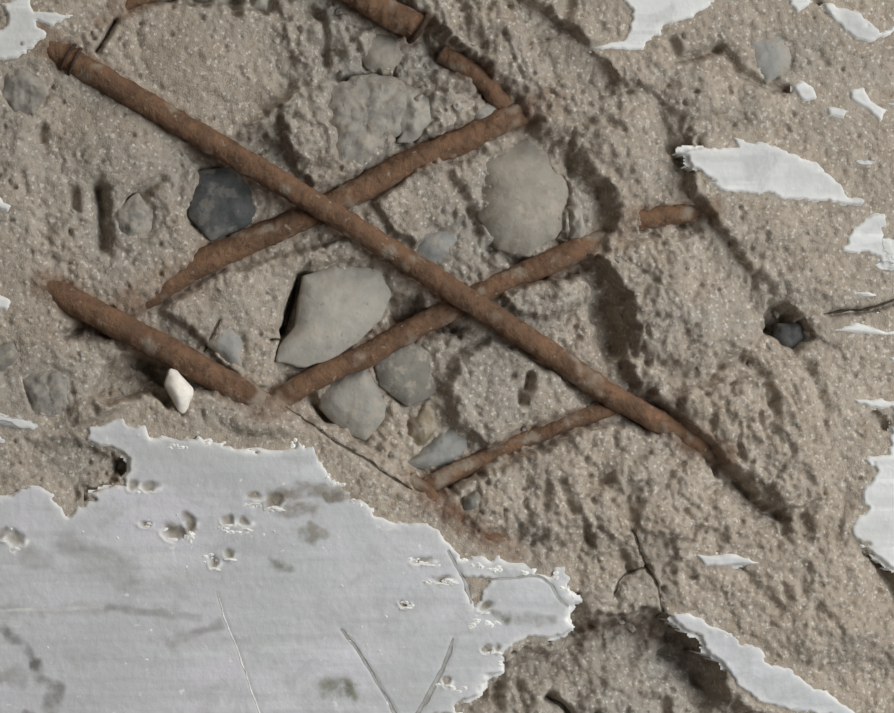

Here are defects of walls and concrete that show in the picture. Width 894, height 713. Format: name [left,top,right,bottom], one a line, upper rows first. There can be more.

peeling [0,0,73,61]
peeling [850,88,886,122]
spalling [17,0,864,602]
peeling [0,415,24,439]
crack [285,406,412,490]
peeling [851,398,894,572]
peeling [0,419,855,713]